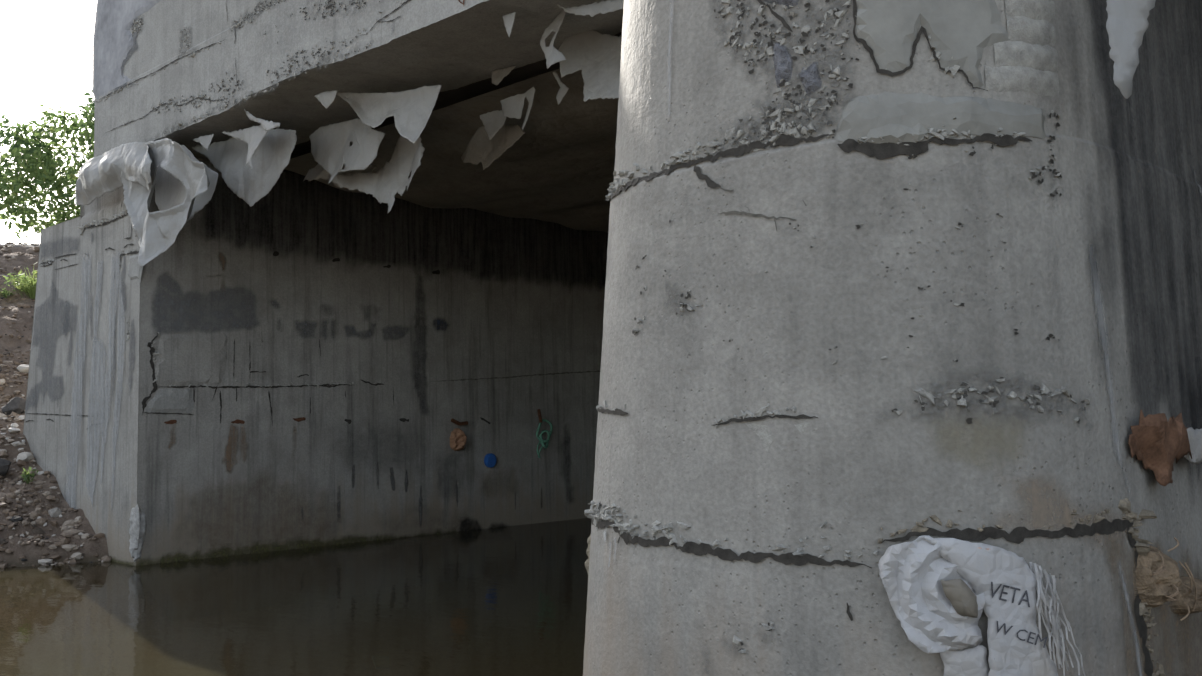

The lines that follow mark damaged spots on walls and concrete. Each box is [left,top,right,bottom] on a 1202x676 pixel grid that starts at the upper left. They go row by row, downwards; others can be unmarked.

crack [96,0,237,133]
crack [358,0,410,36]
crack [853,0,988,91]
crack [606,108,1032,231]
damp [1093,0,1202,430]
damp [153,273,258,332]
crack [26,332,394,429]
crack [584,500,1138,568]
crack [846,603,854,621]